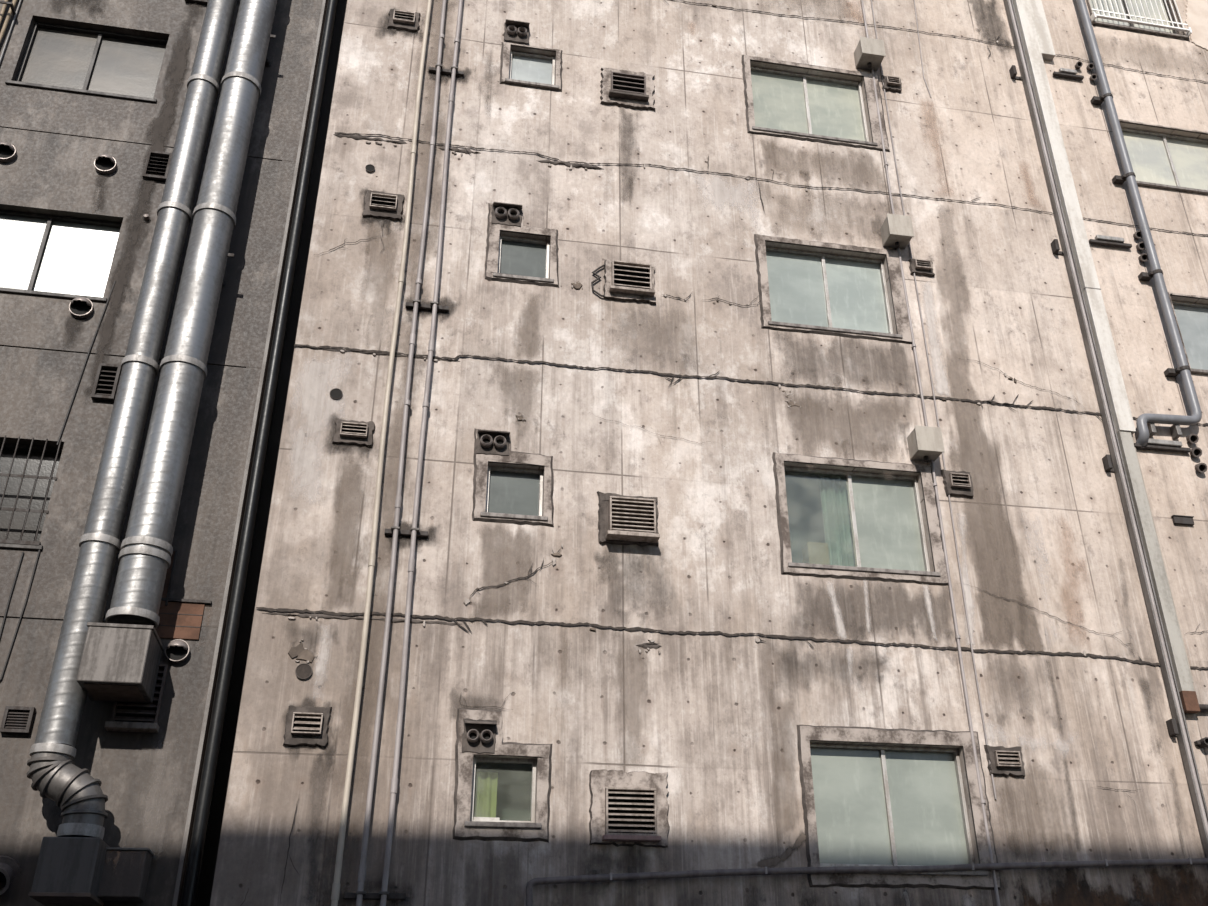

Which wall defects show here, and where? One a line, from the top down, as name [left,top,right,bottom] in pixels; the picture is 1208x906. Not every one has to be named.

leakage [621,114,634,160]
leakage [778,335,907,386]
leakage [924,283,1046,655]
crack [256,544,1160,666]
leakage [803,581,950,662]
rust [1019,865,1208,906]